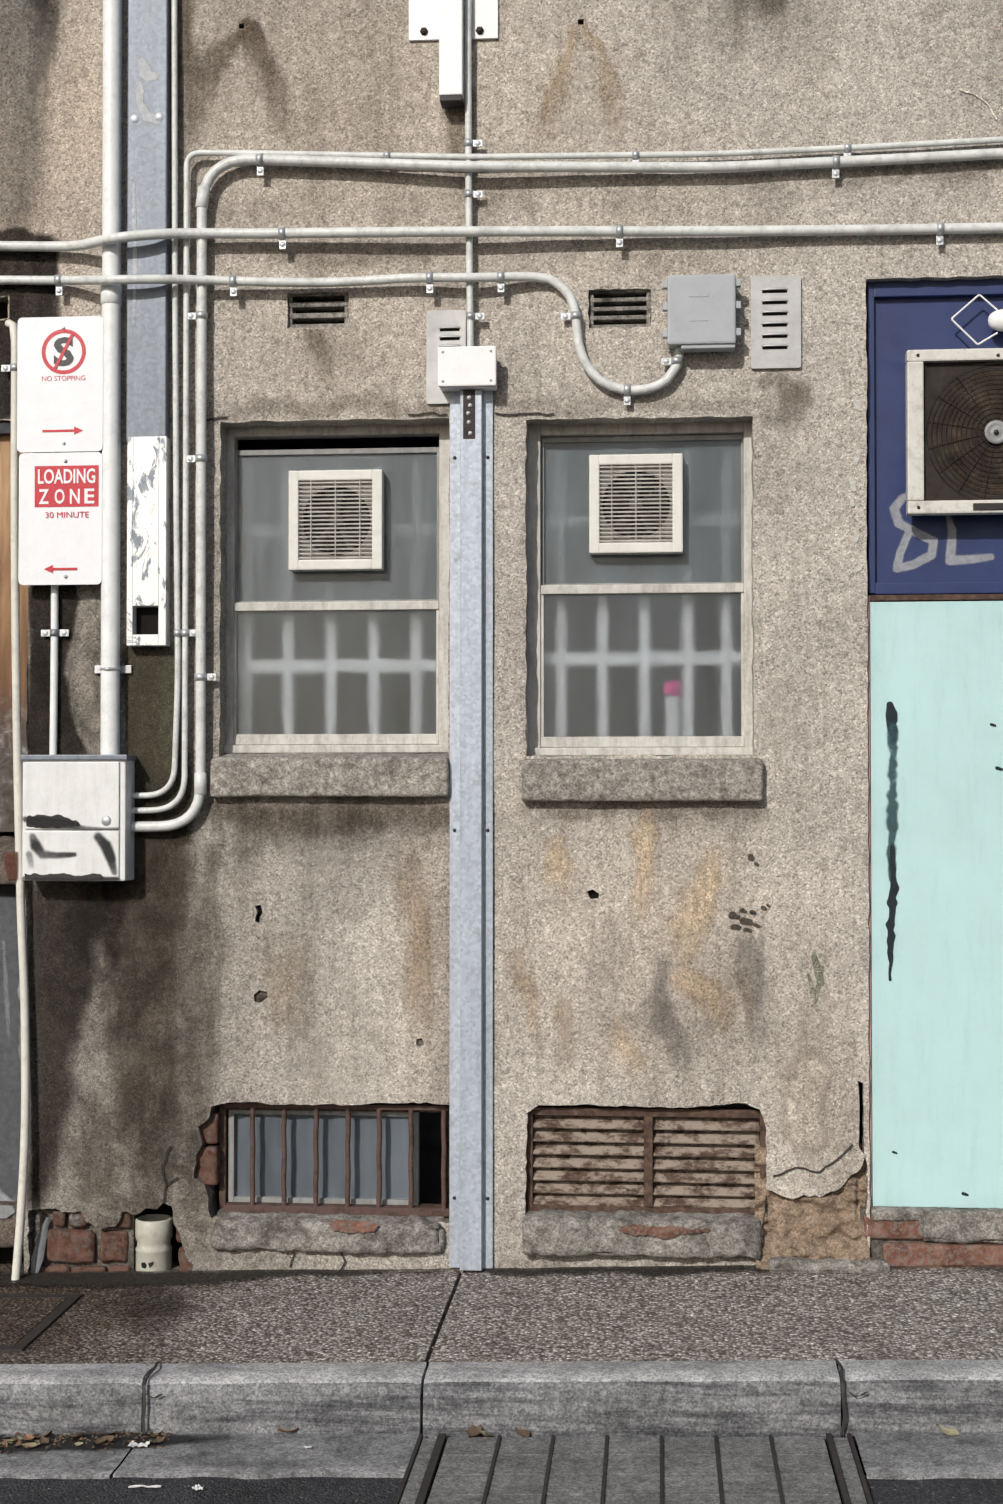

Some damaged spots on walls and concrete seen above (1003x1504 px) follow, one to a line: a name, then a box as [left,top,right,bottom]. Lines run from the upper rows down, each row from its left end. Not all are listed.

damp [177,0,276,103]
damp [0,0,59,419]
damp [26,645,450,1203]
damp [650,962,681,1048]
peeling [0,884,193,1273]
spalling [195,1110,221,1186]
crack [773,1144,853,1177]
spalling [754,1142,891,1273]